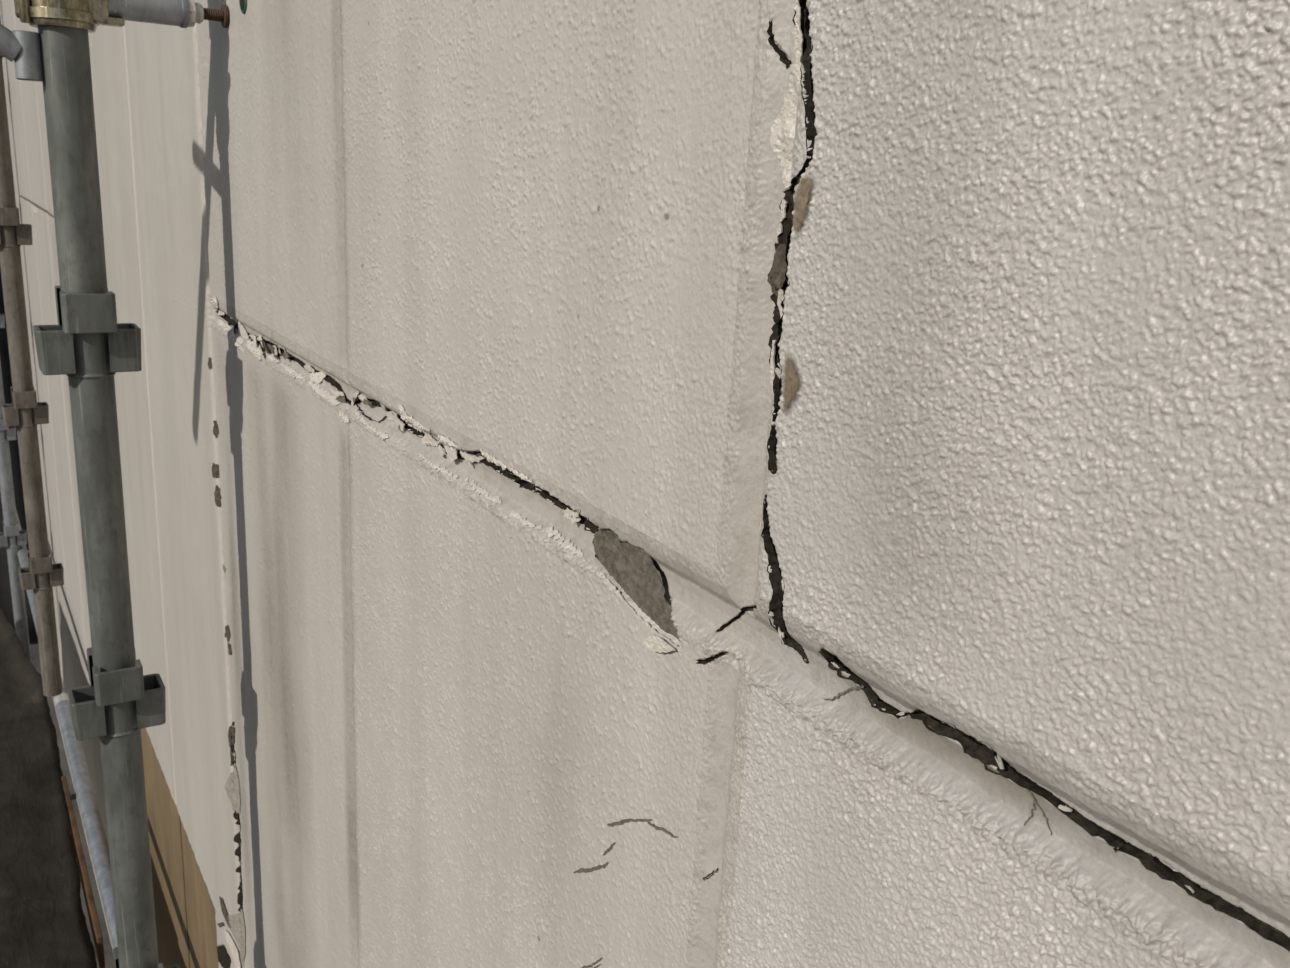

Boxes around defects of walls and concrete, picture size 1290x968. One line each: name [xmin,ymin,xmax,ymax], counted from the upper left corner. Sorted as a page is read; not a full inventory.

crack [216,302,599,533]
peeling [210,295,690,661]
crack [696,0,1290,952]
crack [233,811,242,912]
crack [581,958,602,968]
crack [573,818,678,873]